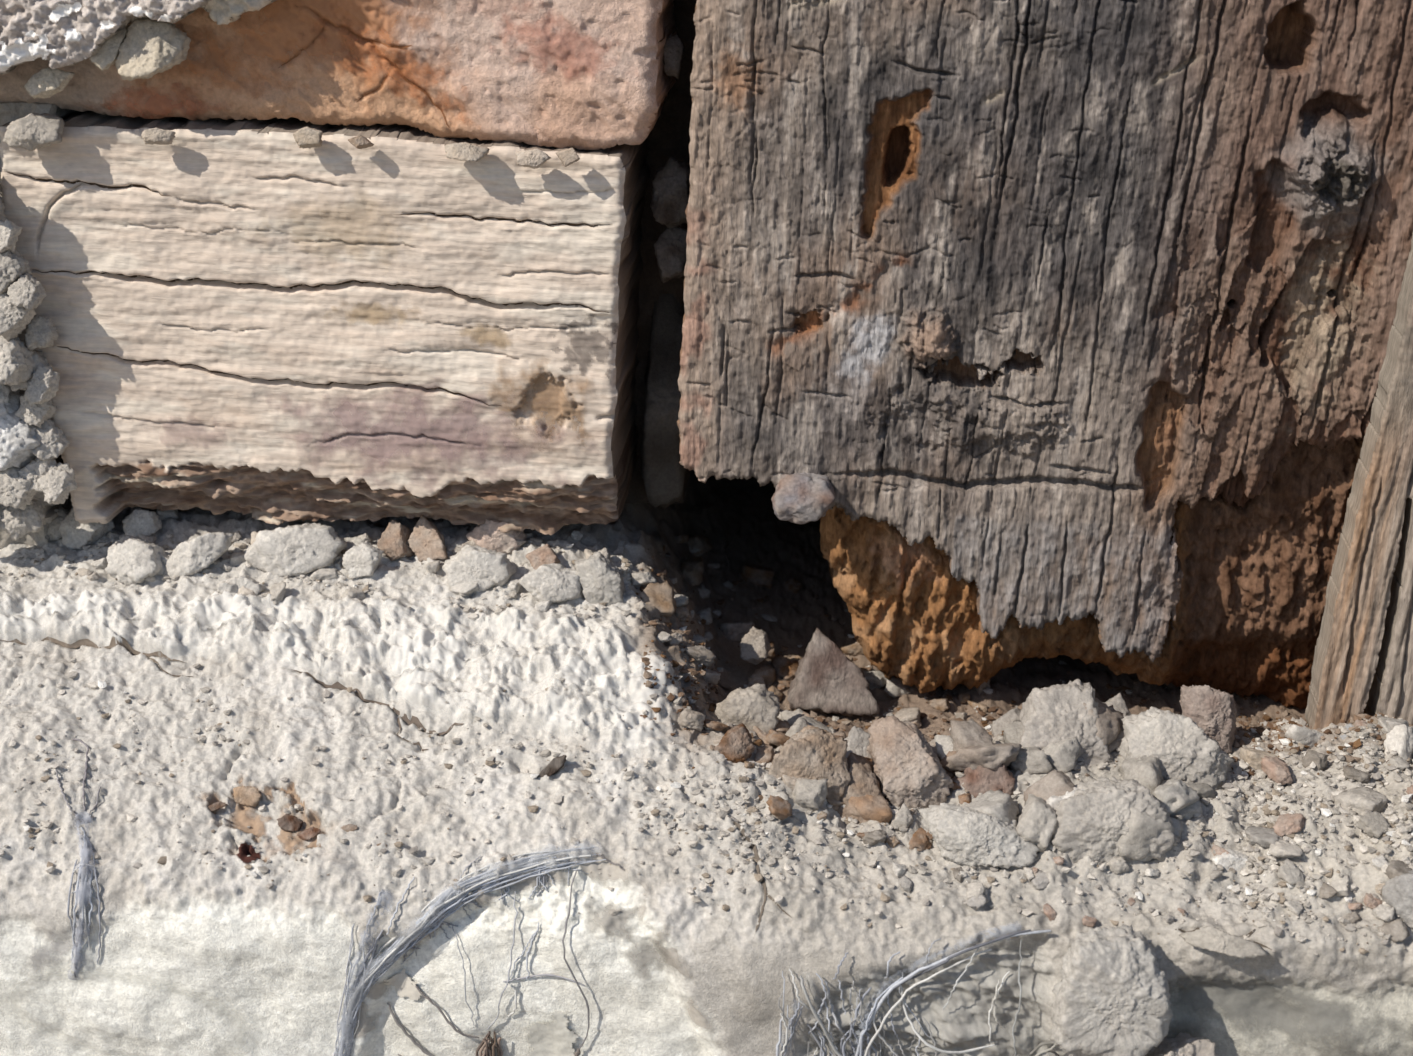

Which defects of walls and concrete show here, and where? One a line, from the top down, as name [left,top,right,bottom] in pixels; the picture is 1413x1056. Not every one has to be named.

spalling [202,0,277,25]
peeling [0,2,82,99]
spalling [89,6,191,81]
crack [279,5,450,128]
crack [7,172,170,196]
crack [393,213,609,227]
crack [37,270,609,313]
crack [57,346,502,406]
crack [1,635,193,677]
crack [291,669,463,751]